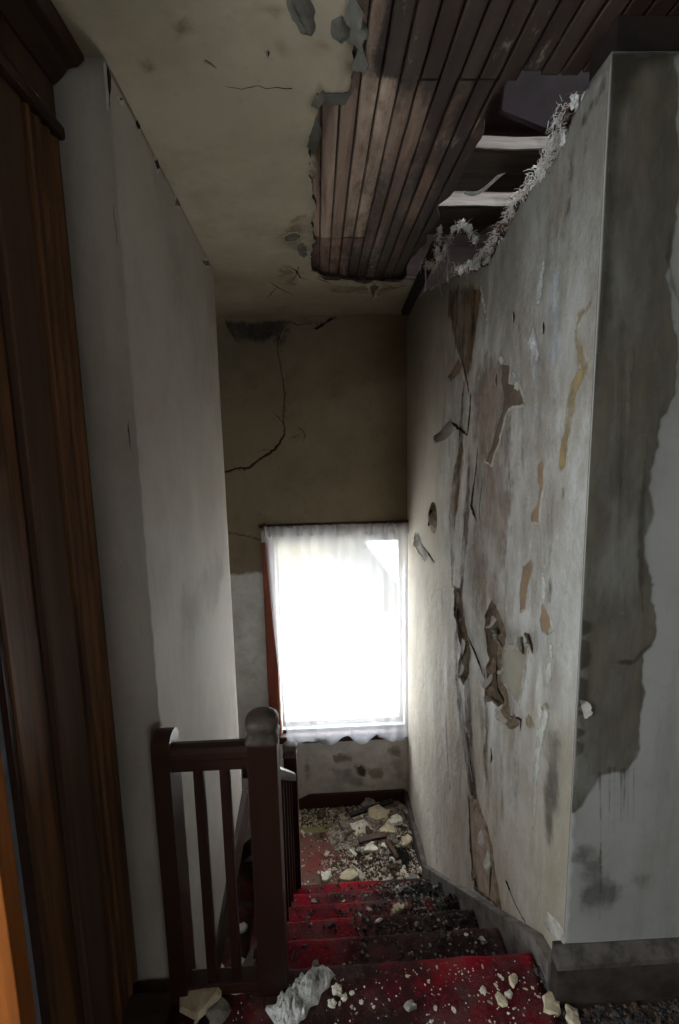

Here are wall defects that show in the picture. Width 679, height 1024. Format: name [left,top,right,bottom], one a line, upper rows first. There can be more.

crack [202,59,292,90]
peeling [330,15,350,44]
crack [225,267,329,474]
flaking render [433,418,467,443]
peeling [484,357,526,468]
leakage [576,52,679,781]
peeling [413,532,435,564]
peeling [453,586,471,685]
peeling [481,600,533,720]
peeling [519,559,534,613]
leakage [572,784,586,812]
peeling [468,794,501,909]